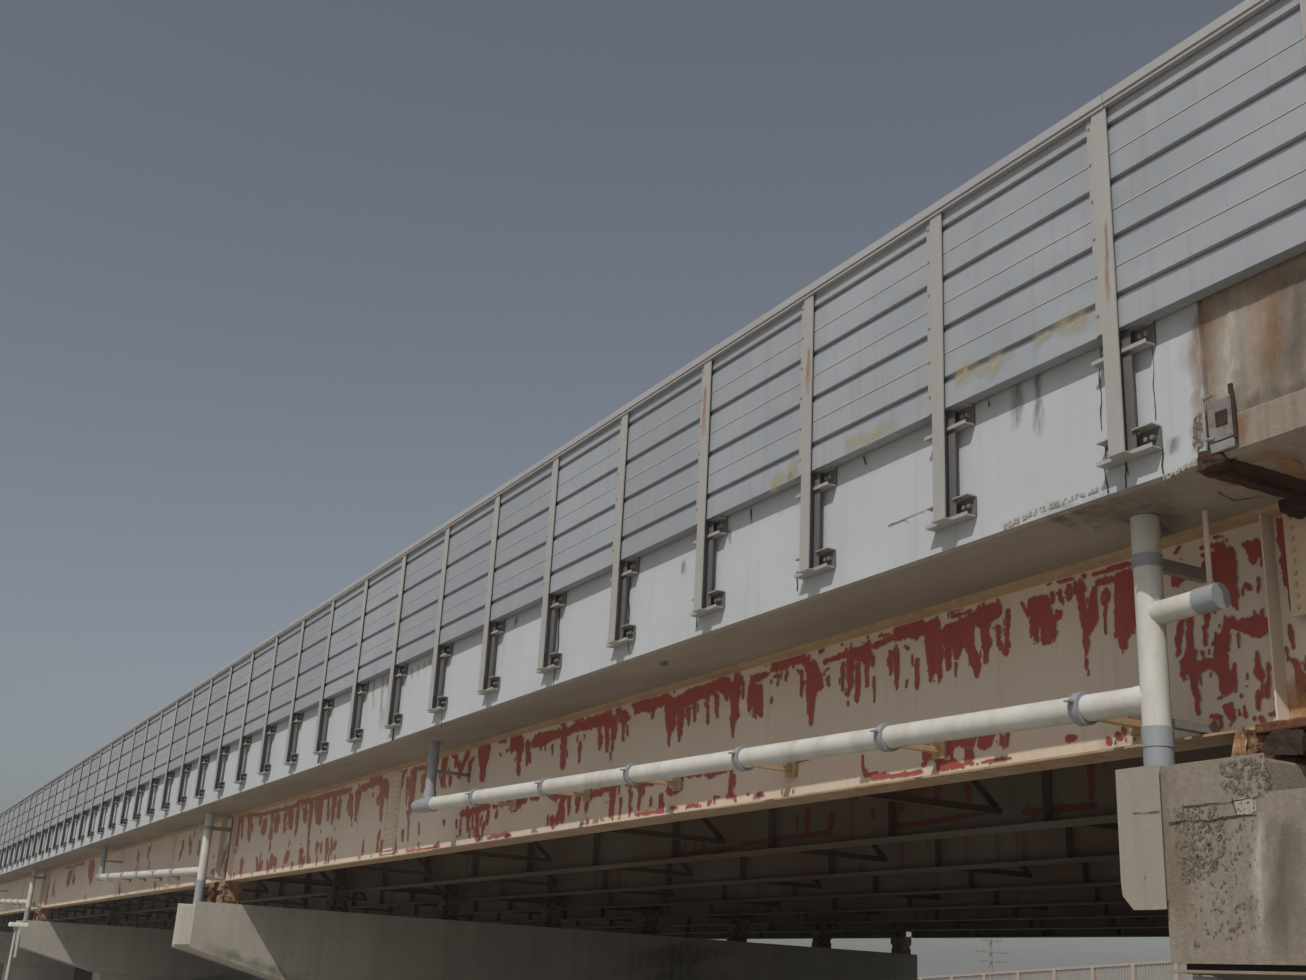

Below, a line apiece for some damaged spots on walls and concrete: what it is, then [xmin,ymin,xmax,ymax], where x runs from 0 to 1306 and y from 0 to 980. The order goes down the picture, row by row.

spalling [1003,487,1098,529]
peeling [178,561,1136,881]
peeling [1174,517,1306,729]
spalling [1174,755,1269,949]